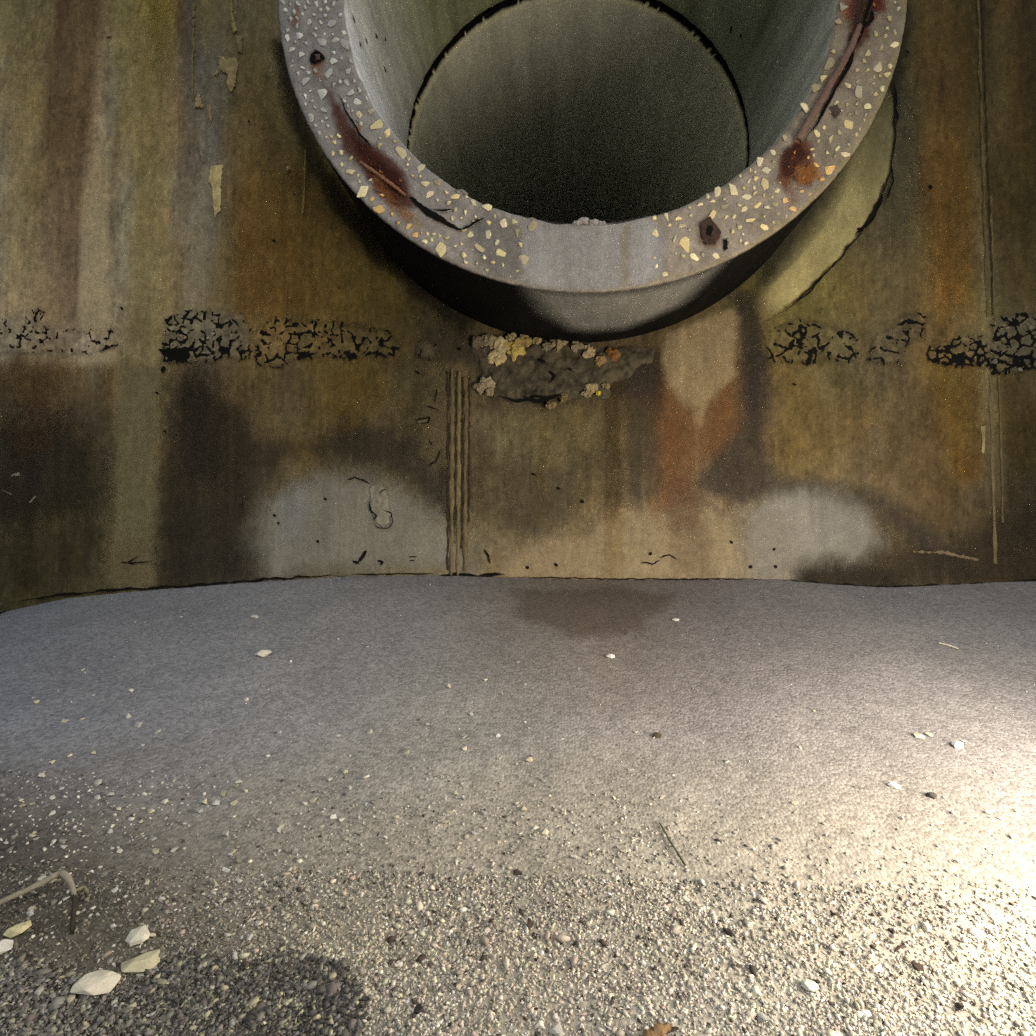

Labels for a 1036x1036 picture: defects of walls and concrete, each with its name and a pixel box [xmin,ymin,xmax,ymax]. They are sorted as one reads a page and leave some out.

corrosion [848,0,882,51]
corrosion [331,102,412,208]
corrosion [780,142,816,187]
crack [770,83,899,320]
spalling [0,308,118,356]
spalling [159,310,400,373]
damp [263,42,874,578]